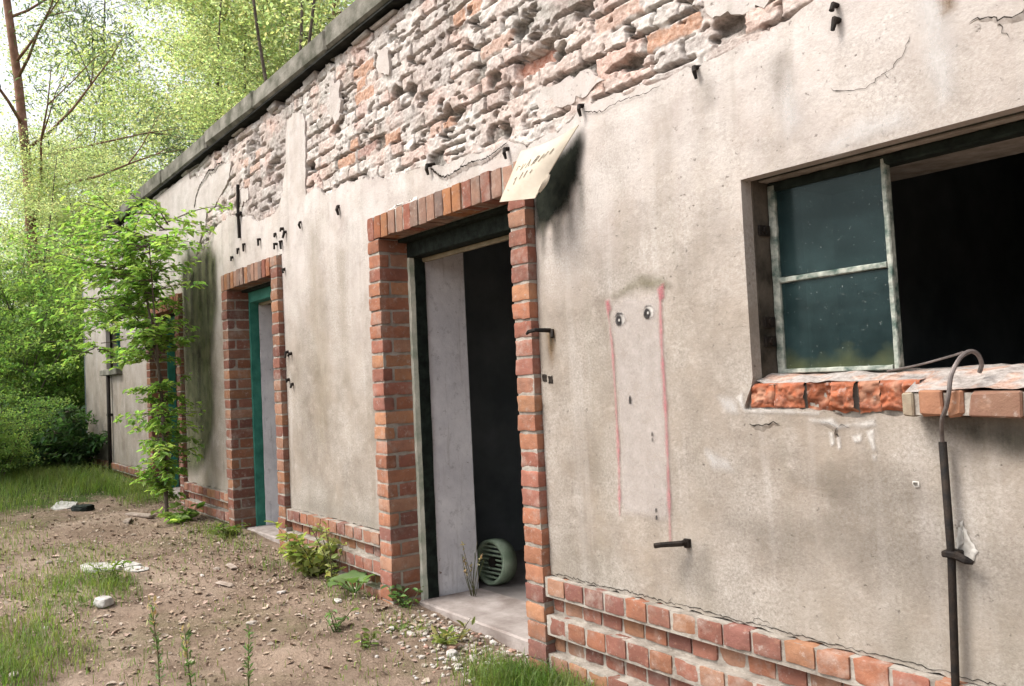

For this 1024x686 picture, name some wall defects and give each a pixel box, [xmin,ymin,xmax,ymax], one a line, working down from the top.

crack [969,10,1024,37]
crack [833,37,910,91]
crack [584,86,659,113]
flaking render [190,0,813,253]
crack [430,143,506,181]